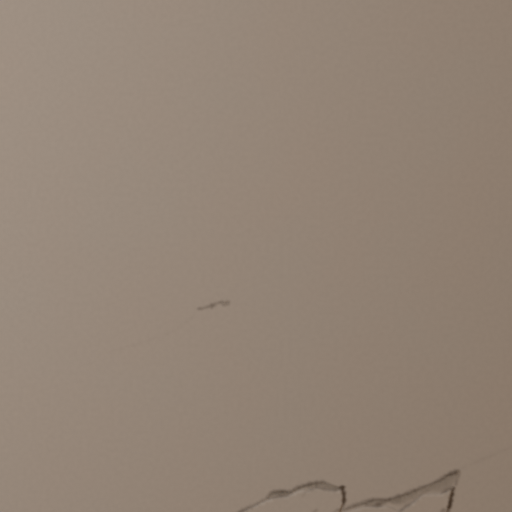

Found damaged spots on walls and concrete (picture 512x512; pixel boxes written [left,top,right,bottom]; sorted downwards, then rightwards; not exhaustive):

peeling [243,486,346,512]
peeling [348,488,454,512]